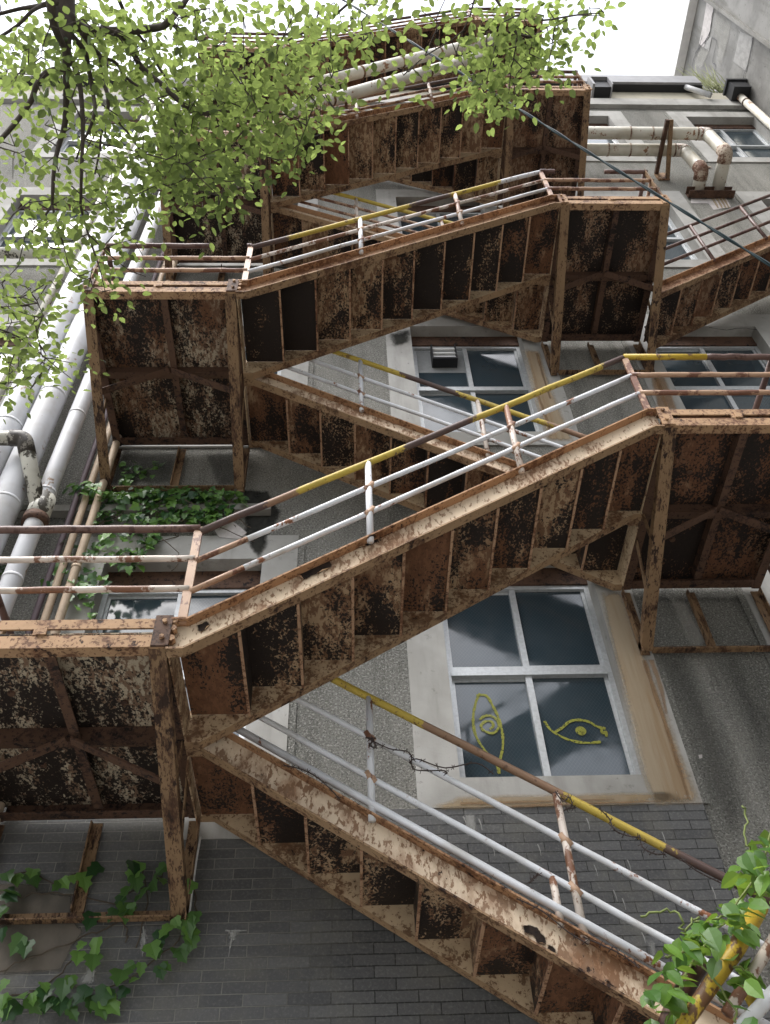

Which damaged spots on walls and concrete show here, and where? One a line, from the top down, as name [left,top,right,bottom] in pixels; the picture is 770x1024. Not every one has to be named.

rust [441,593,694,808]